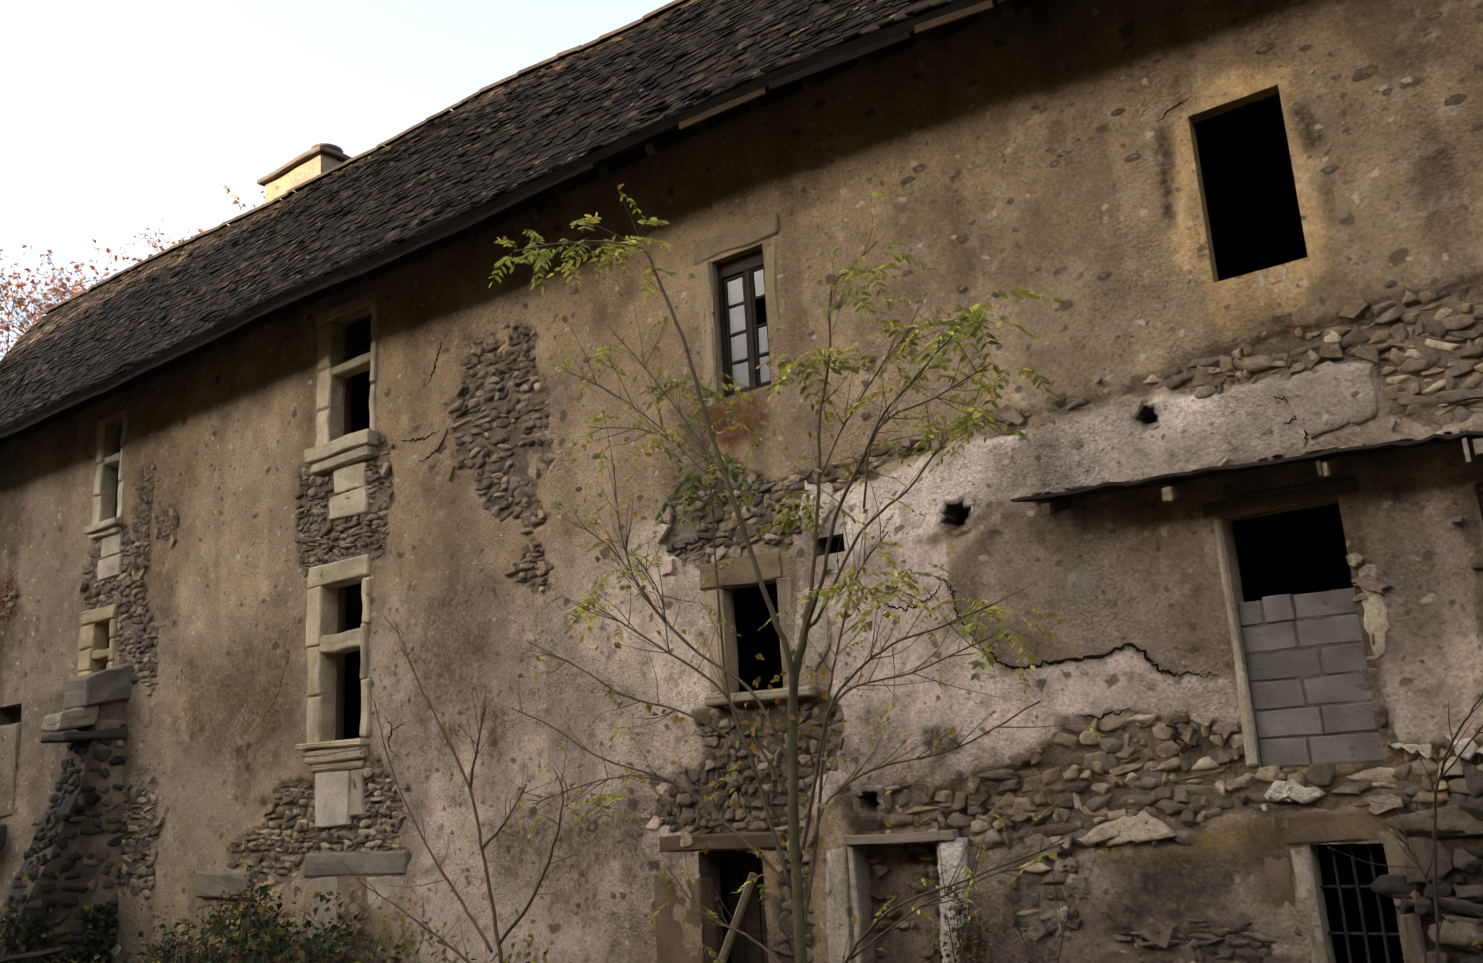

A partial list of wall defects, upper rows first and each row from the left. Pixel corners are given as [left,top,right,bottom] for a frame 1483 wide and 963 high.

flaking render [76,465,180,696]
flaking render [444,322,566,595]
flaking render [790,564,832,671]
crack [886,582,1217,678]
flaking render [649,280,1483,576]
flaking render [1450,483,1483,654]
flaking render [118,776,166,901]
flaking render [226,754,412,889]
flaking render [641,692,845,963]
flaking render [852,553,1483,963]